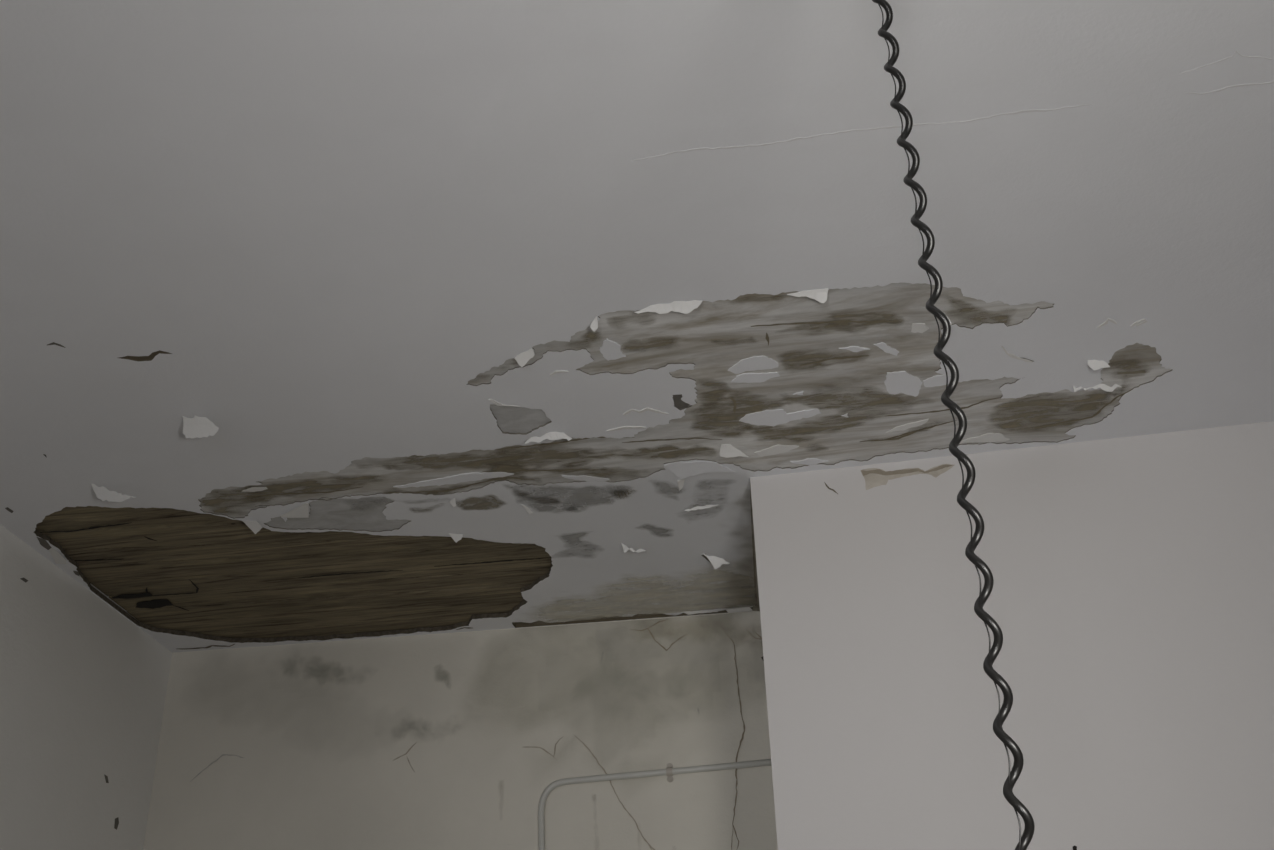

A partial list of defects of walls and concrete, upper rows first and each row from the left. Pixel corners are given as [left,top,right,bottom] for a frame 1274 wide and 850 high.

water stain [525,487,617,511]
peeling [34,283,1172,643]
crack [512,607,762,850]